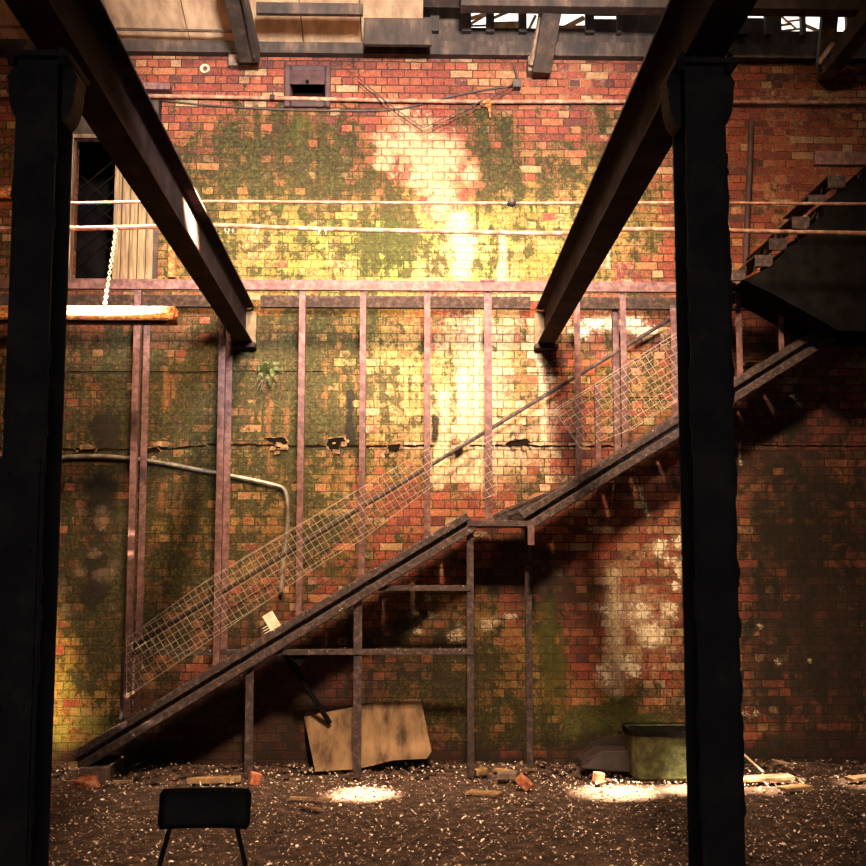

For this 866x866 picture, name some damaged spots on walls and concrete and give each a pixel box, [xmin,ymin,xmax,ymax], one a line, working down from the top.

spalling [264,436,289,455]
spalling [325,436,349,454]
crack [62,434,622,458]
spalling [384,443,404,454]
spalling [500,438,532,451]
efflorescence [653,535,682,591]
efflorescence [593,594,678,690]